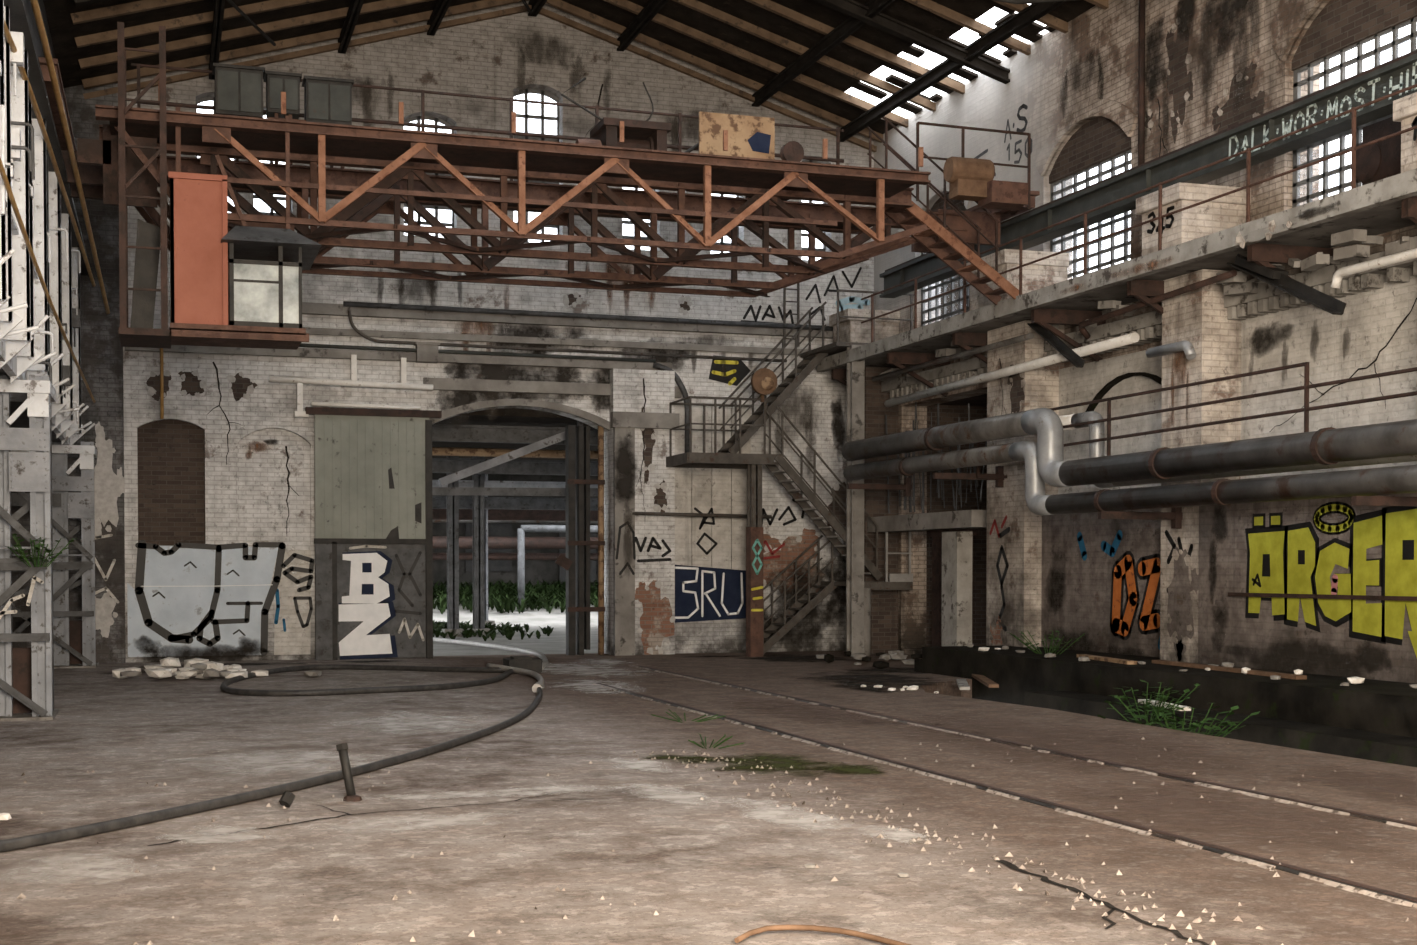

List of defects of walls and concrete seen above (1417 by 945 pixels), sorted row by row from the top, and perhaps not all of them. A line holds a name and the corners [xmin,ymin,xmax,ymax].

water stain [1062,52,1103,111]
water stain [1145,0,1260,138]
peeling [146,370,207,401]
crack [208,362,241,465]
peeling [226,371,257,401]
crack [285,446,299,534]
spalling [629,580,991,741]
spalling [771,732,1020,800]
spalling [1053,807,1152,836]
spalling [1193,782,1350,816]
spalling [1221,853,1276,869]
spalling [1298,873,1417,908]